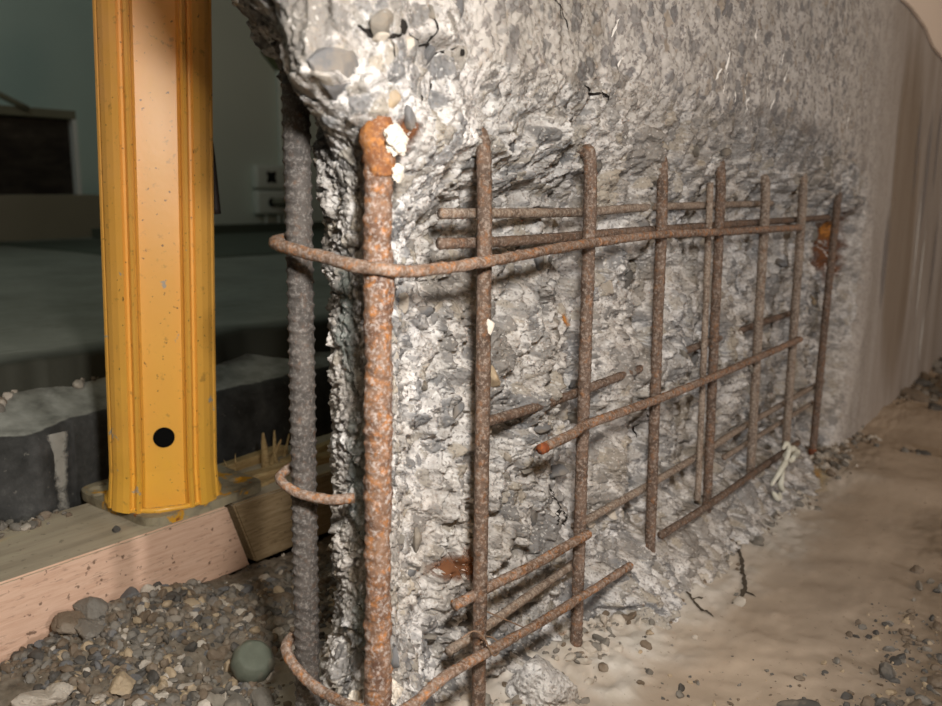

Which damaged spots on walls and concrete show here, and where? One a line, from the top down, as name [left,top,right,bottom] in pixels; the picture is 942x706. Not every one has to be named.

rust [358,116,420,177]
rust [811,210,852,276]
spalling [231,0,868,706]
rust [433,550,474,582]